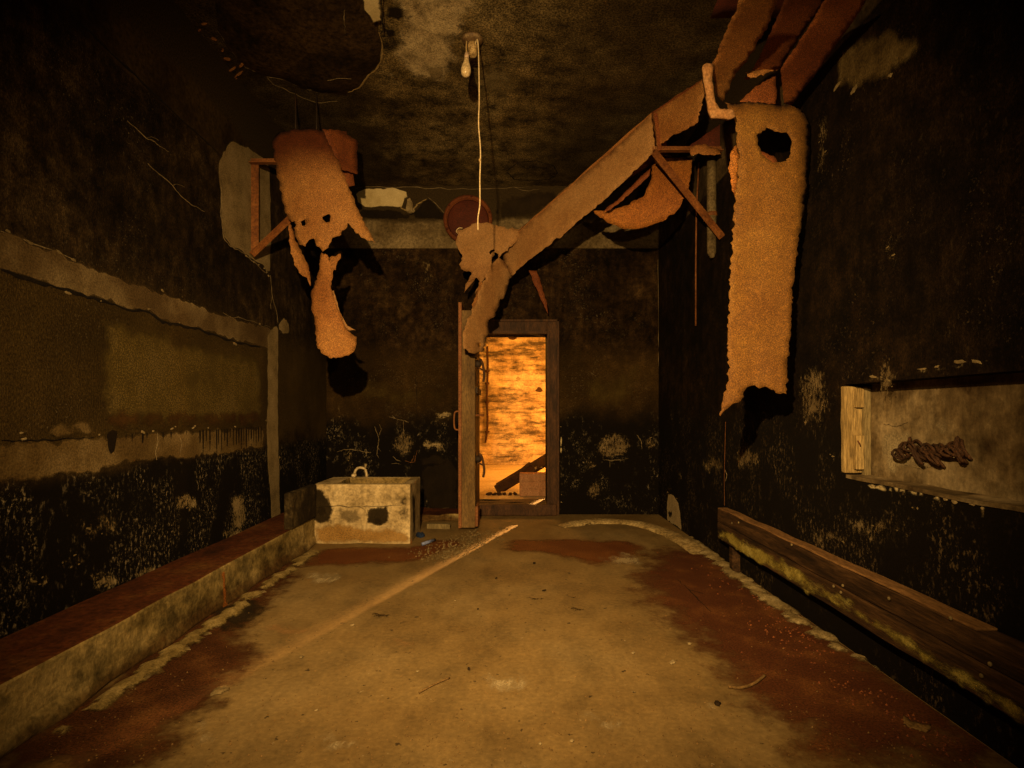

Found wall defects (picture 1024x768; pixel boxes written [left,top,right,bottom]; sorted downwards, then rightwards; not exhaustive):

peeling [364,0,384,37]
flaking render [219,142,271,277]
peeling [356,187,444,219]
damp [588,434,630,468]
damp [392,431,458,531]
damp [314,490,389,525]
damp [213,600,264,631]
rust [0,524,459,768]
rust [507,539,994,768]